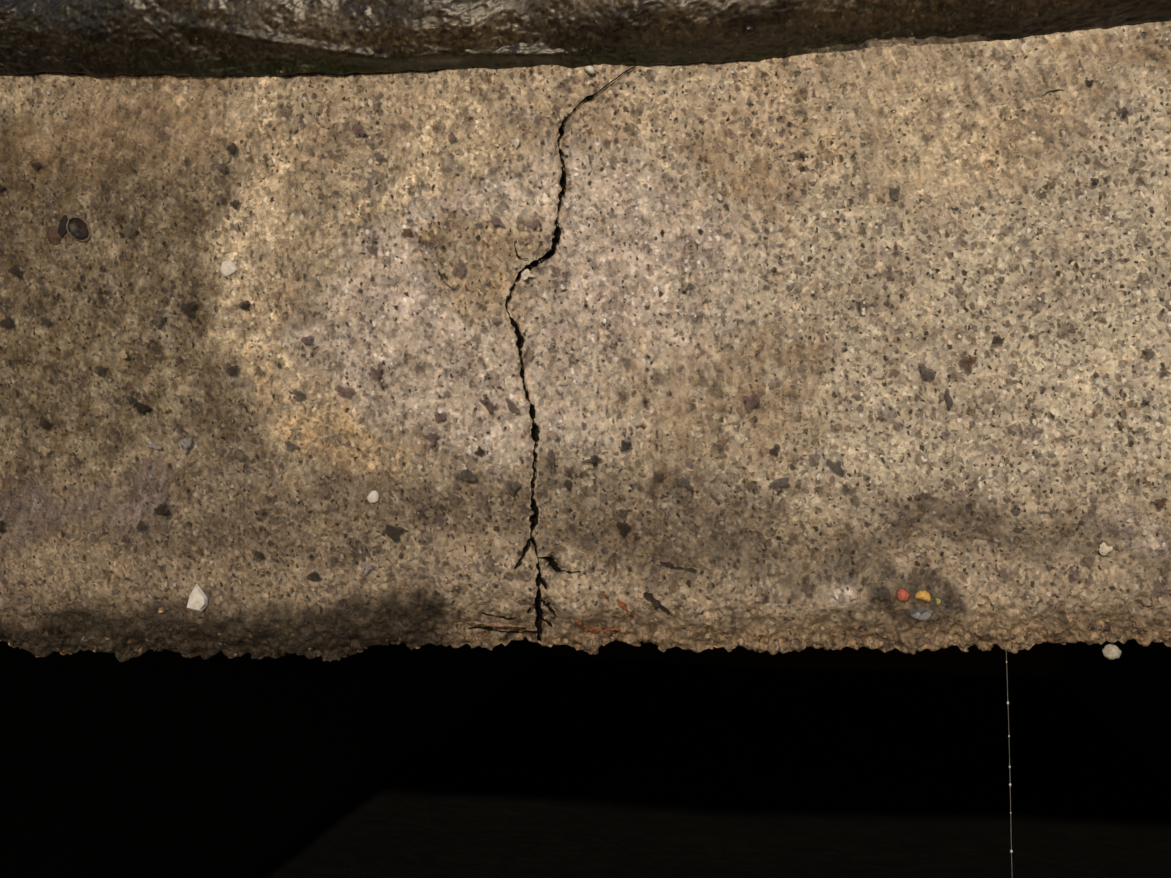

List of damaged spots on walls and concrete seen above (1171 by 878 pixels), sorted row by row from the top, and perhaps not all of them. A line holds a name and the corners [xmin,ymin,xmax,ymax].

crack [467,65,637,641]